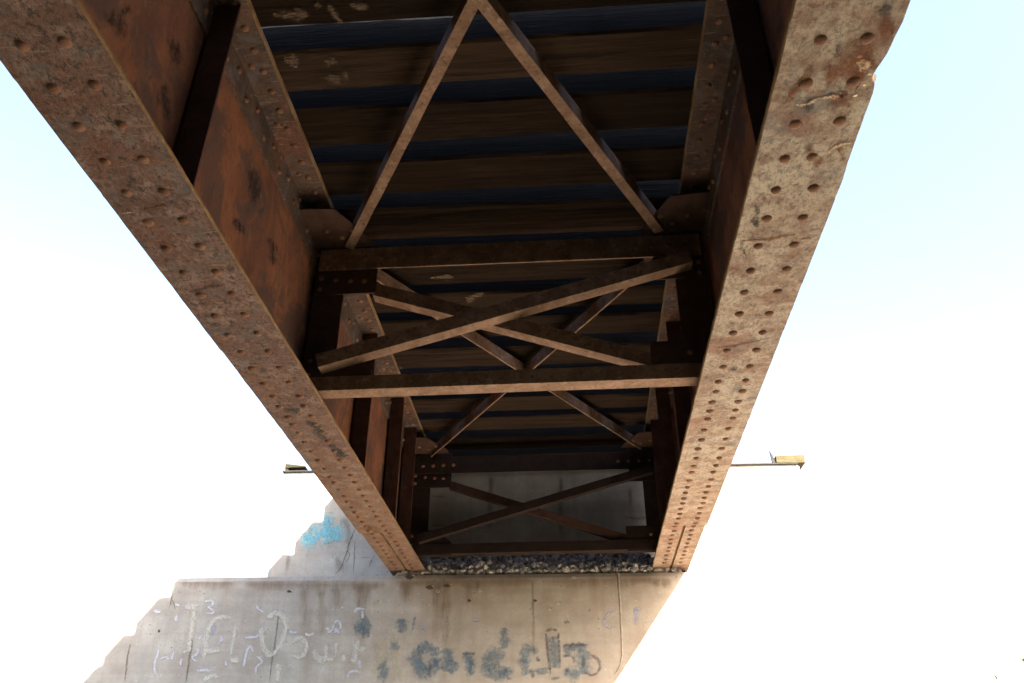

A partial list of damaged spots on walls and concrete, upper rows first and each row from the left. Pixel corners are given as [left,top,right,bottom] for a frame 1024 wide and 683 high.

corrosion [825,39,873,107]
peeling [853,60,877,97]